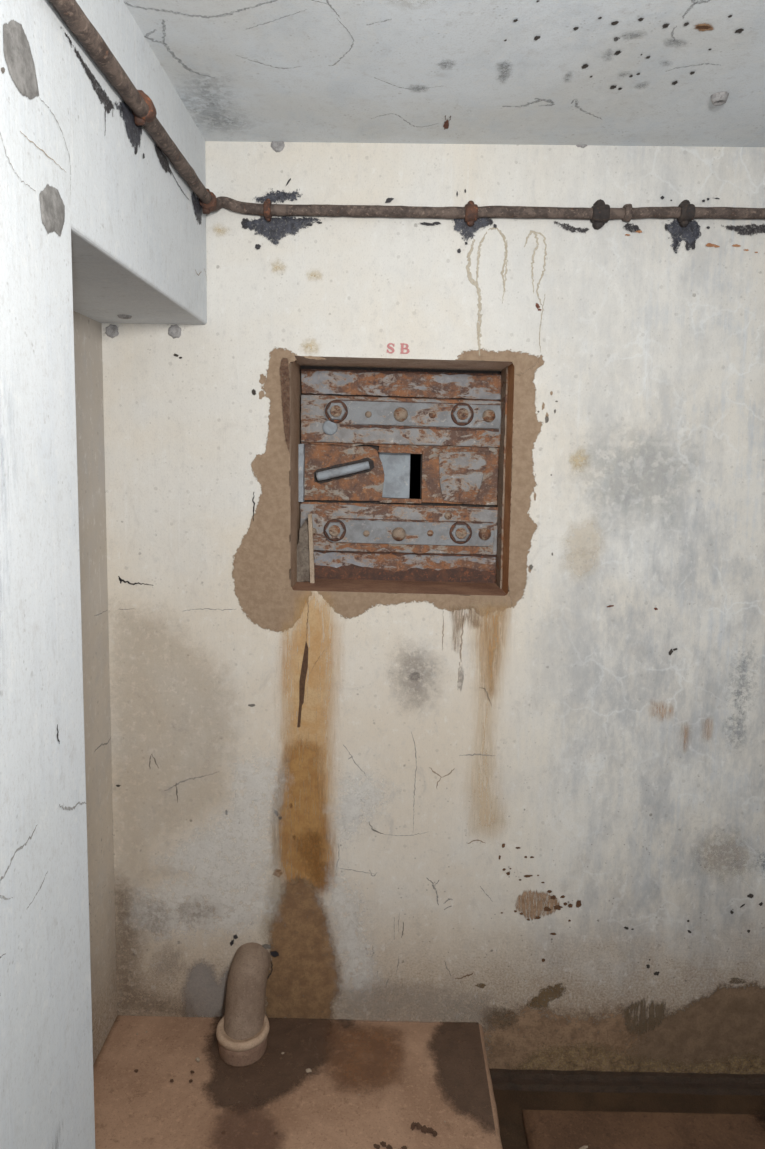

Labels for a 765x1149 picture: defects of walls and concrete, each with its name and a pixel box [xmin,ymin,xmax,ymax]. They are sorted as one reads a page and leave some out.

crack [297,605,324,727]
corrosion [314,564,496,583]
corrosion [442,609,502,689]
corrosion [265,597,341,1020]
water stain [184,963,334,1149]
water stain [429,978,765,1130]